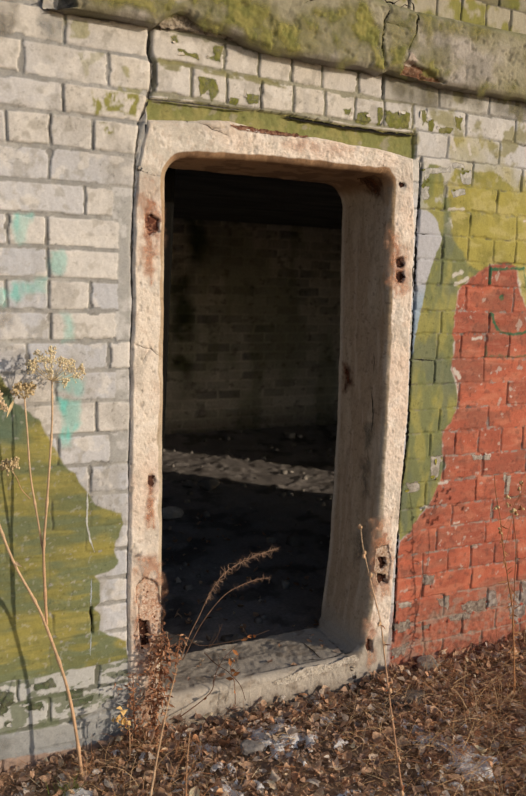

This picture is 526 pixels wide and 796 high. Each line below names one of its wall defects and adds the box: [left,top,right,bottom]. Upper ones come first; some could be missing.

crack [381,0,420,58]
crack [281,116,411,136]
crack [129,31,244,377]
crack [392,163,434,634]
spalling [135,577,163,655]
peeling [508,581,526,623]
peeling [0,689,44,727]
peeling [31,678,56,691]
peeling [65,688,93,709]